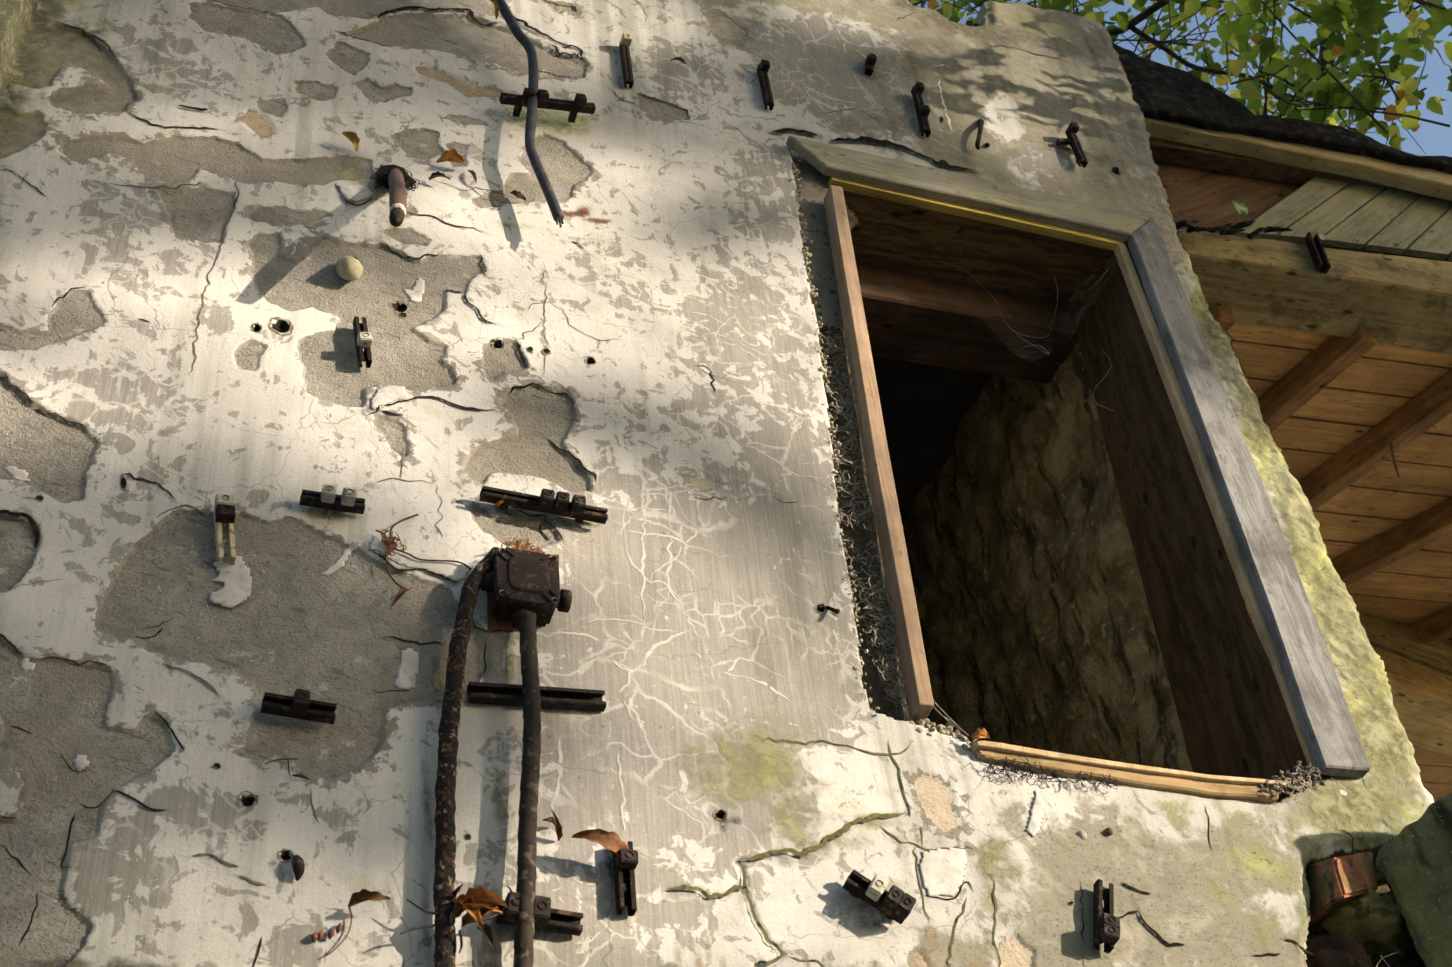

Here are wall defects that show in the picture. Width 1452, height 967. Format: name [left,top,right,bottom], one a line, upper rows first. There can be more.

water stain [0,0,59,124]
flaking render [0,29,135,158]
flaking render [61,139,373,242]
flaking render [191,0,584,102]
crack [771,108,972,171]
flaking render [250,209,483,457]
flaking render [0,376,94,502]
flaking render [465,343,589,493]
water stain [1200,294,1416,840]
flaking render [98,512,487,778]
flaking render [0,644,170,967]
crack [666,735,1001,967]